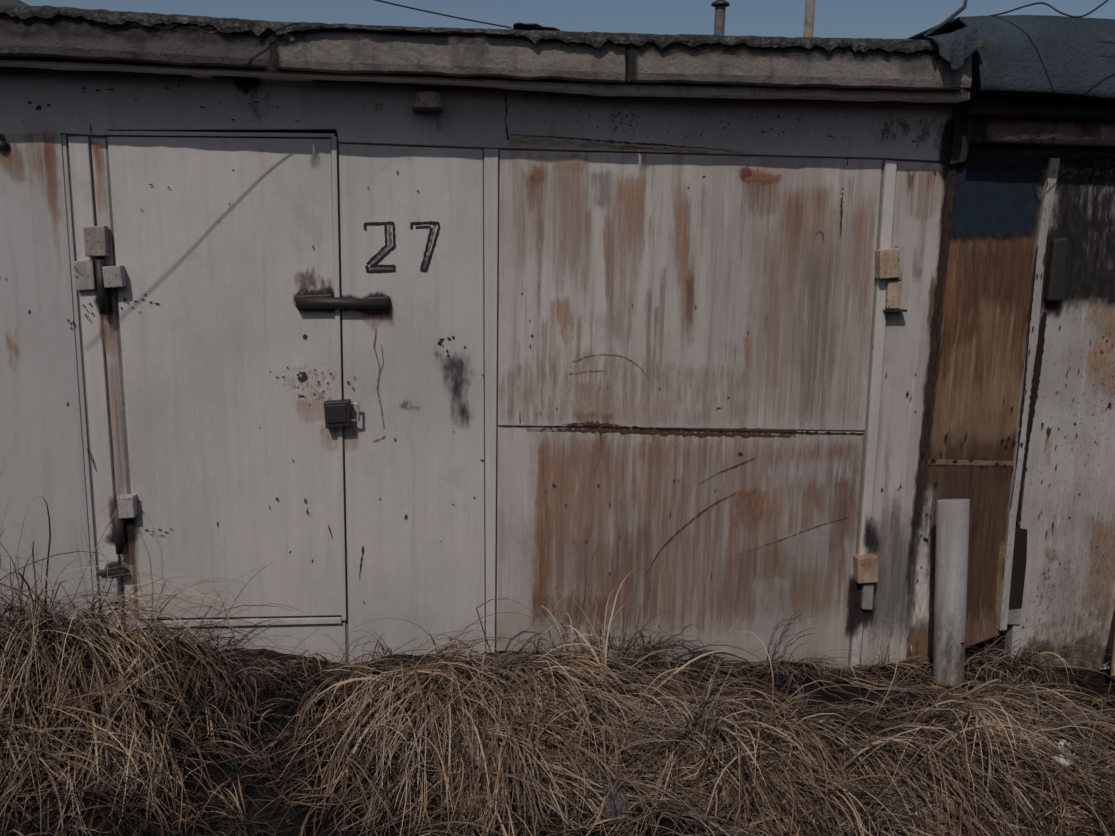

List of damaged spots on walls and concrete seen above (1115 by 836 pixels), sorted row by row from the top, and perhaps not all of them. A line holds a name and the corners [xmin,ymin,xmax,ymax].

rust [564,162,643,321]
rust [740,166,781,183]
rust [534,439,855,629]
rust [926,433,1016,620]